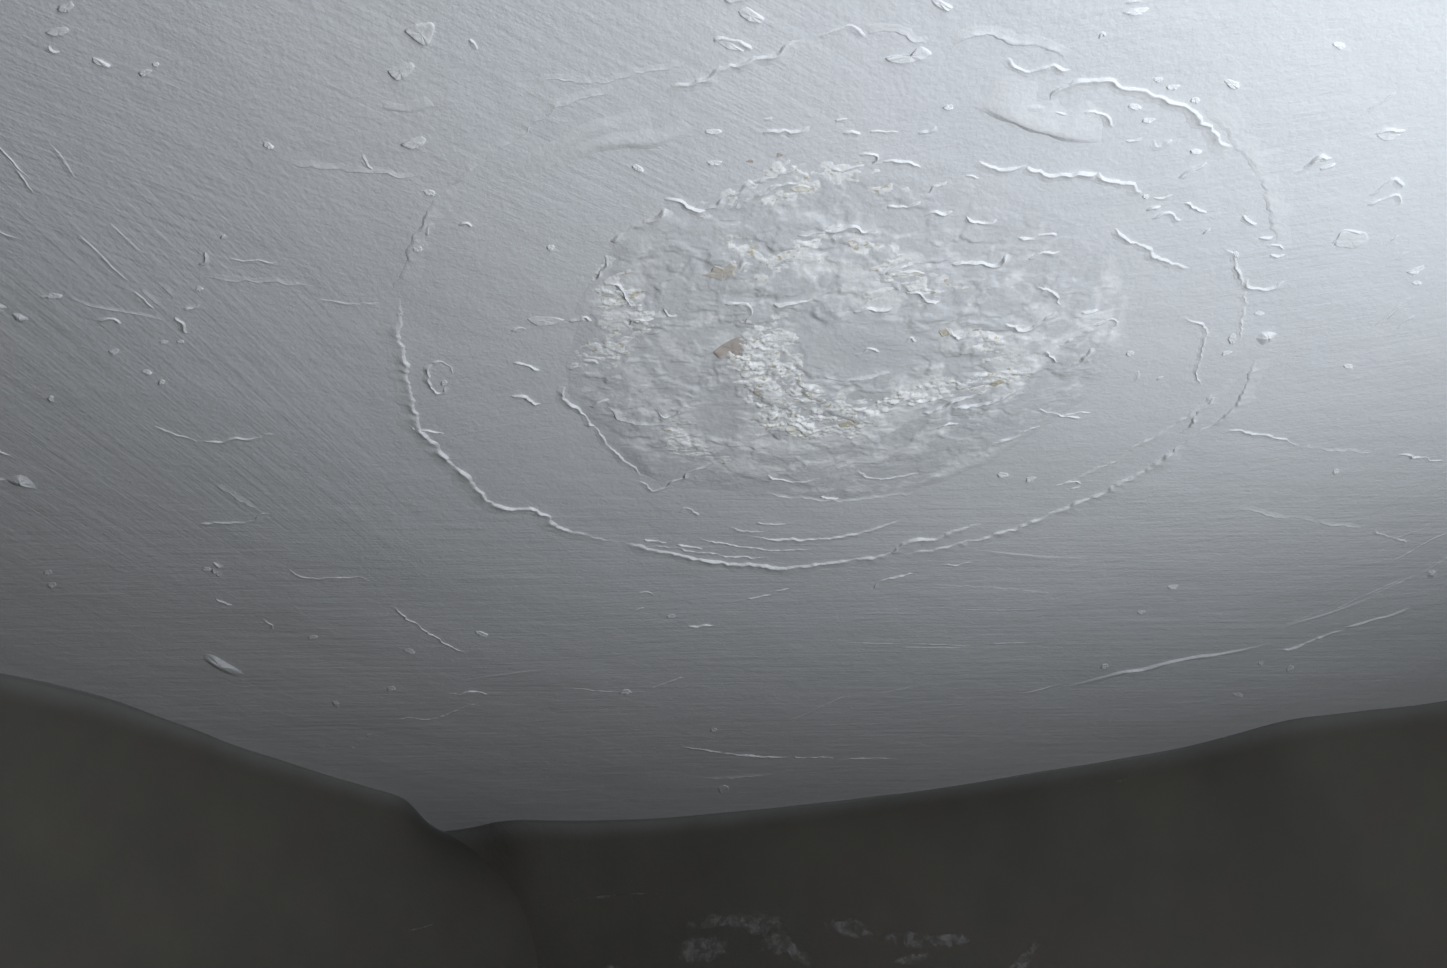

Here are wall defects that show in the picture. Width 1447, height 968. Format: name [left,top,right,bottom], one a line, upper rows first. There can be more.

peeling [725,0,764,23]
peeling [1143,194,1211,234]
peeling [1240,215,1285,259]
peeling [510,117,1140,502]